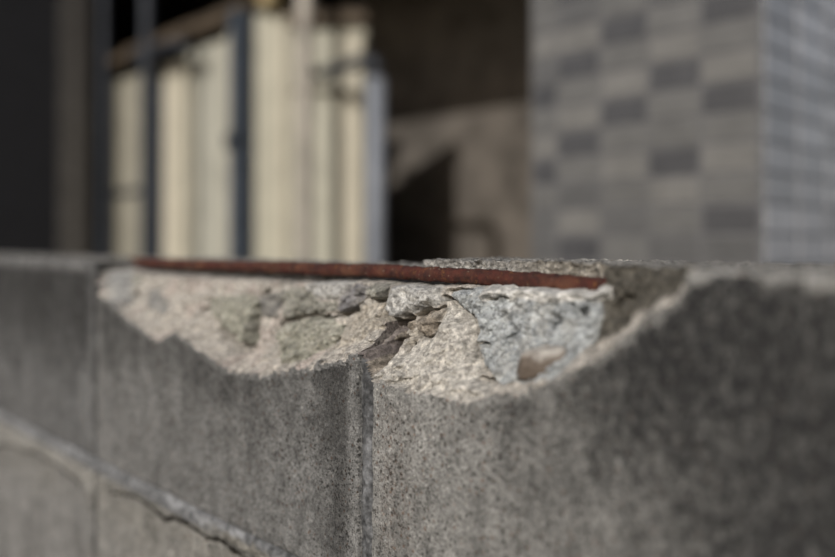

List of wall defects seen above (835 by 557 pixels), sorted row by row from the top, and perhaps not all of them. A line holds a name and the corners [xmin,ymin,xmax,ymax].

corrosion [130,257,607,291]
spalling [97,259,696,404]
crack [111,492,244,557]